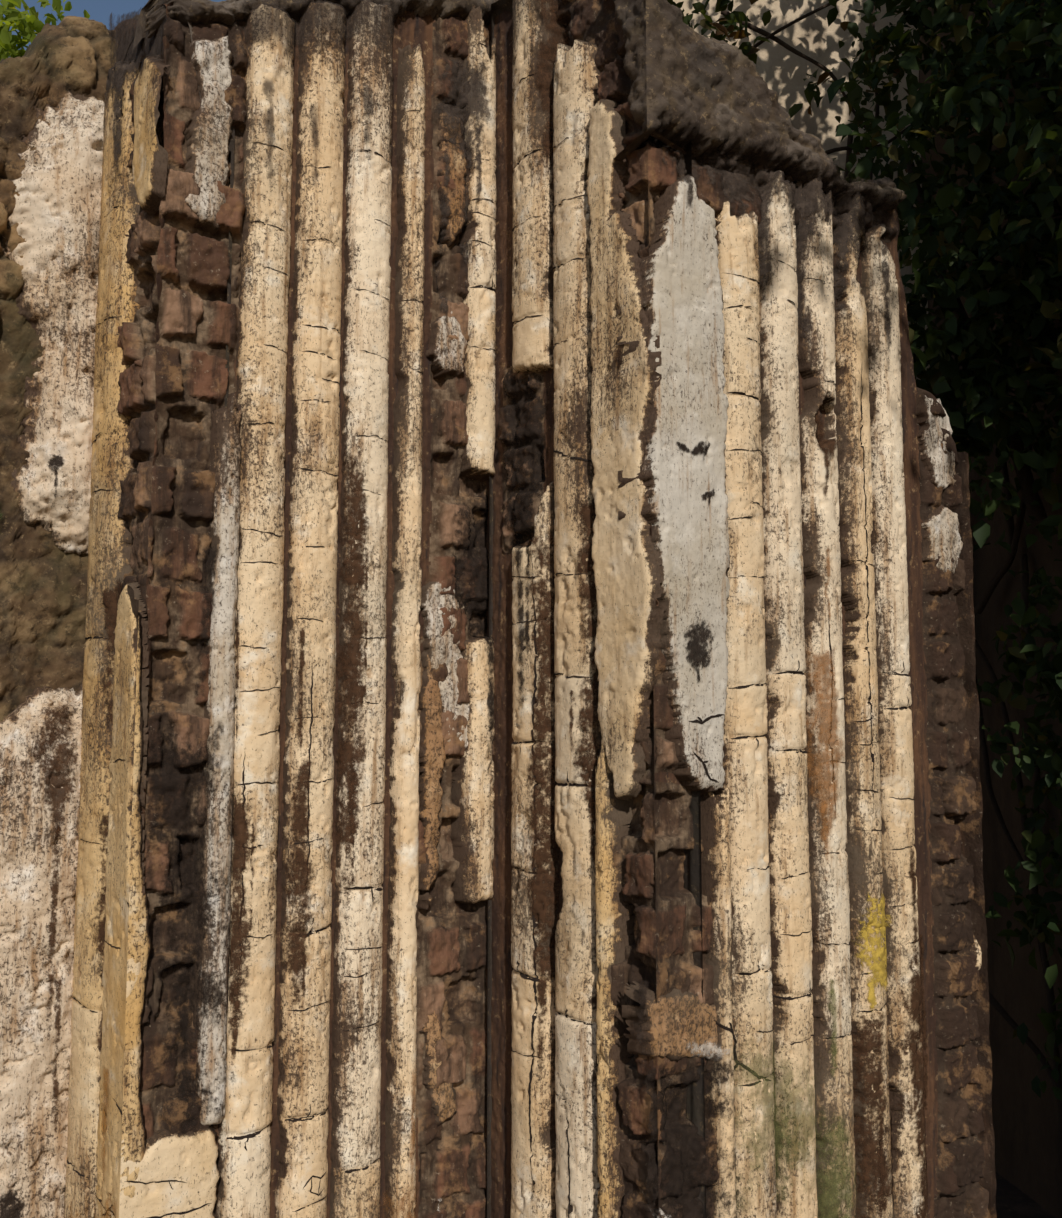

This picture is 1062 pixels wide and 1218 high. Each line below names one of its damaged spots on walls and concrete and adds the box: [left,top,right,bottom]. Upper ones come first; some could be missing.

spalling [430,13,470,341]
crack [67,1158,211,1218]
spalling [117,17,249,1140]
crack [292,1158,379,1212]
leakage [334,452,369,904]
spalling [415,360,492,1218]
spalling [595,635,715,1018]
spalling [617,1054,719,1218]
crack [736,961,812,1000]
crack [714,1003,886,1086]
crack [690,348,916,907]
spalling [916,387,989,1218]